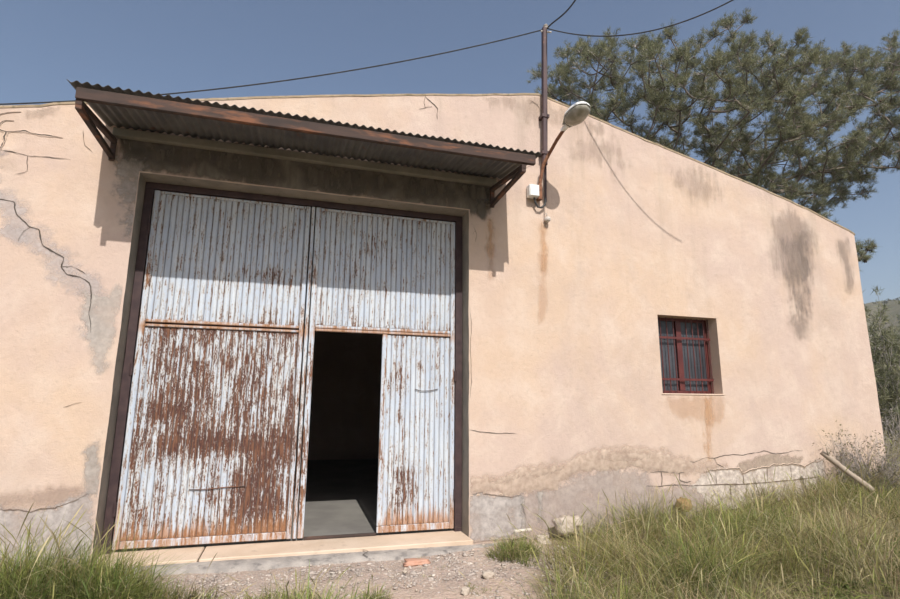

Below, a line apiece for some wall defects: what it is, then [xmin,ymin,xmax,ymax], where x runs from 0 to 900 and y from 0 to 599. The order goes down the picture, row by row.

crack [0,111,90,174]
crack [0,199,92,333]
spalling [693,454,826,509]
spalling [0,495,93,571]